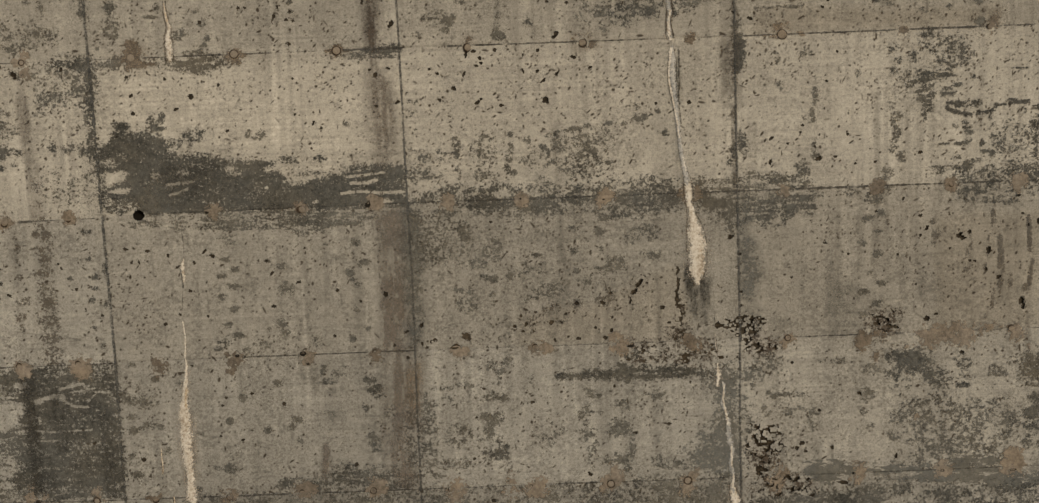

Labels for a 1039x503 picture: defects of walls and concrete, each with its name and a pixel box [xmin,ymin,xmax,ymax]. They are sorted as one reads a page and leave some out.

damp [0,0,376,370]
crack [663,0,715,285]
damp [21,378,41,455]
crack [159,217,202,503]
peeling [184,307,1039,503]
peeling [555,266,783,384]
crack [714,317,744,503]